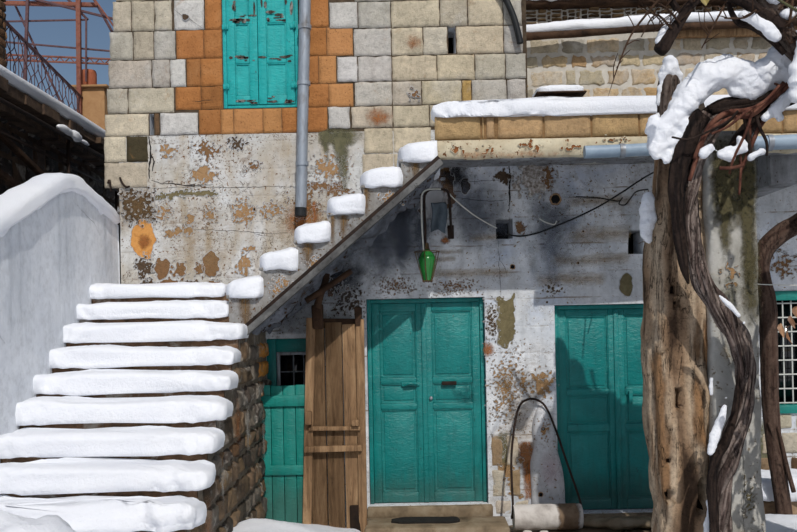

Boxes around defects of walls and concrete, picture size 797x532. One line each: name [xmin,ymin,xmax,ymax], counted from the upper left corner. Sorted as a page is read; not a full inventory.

peeling [117,134,263,284]
crack [148,136,293,189]
peeling [228,149,358,229]
leakage [373,180,447,266]
leakage [458,187,494,241]
peeling [329,273,555,501]